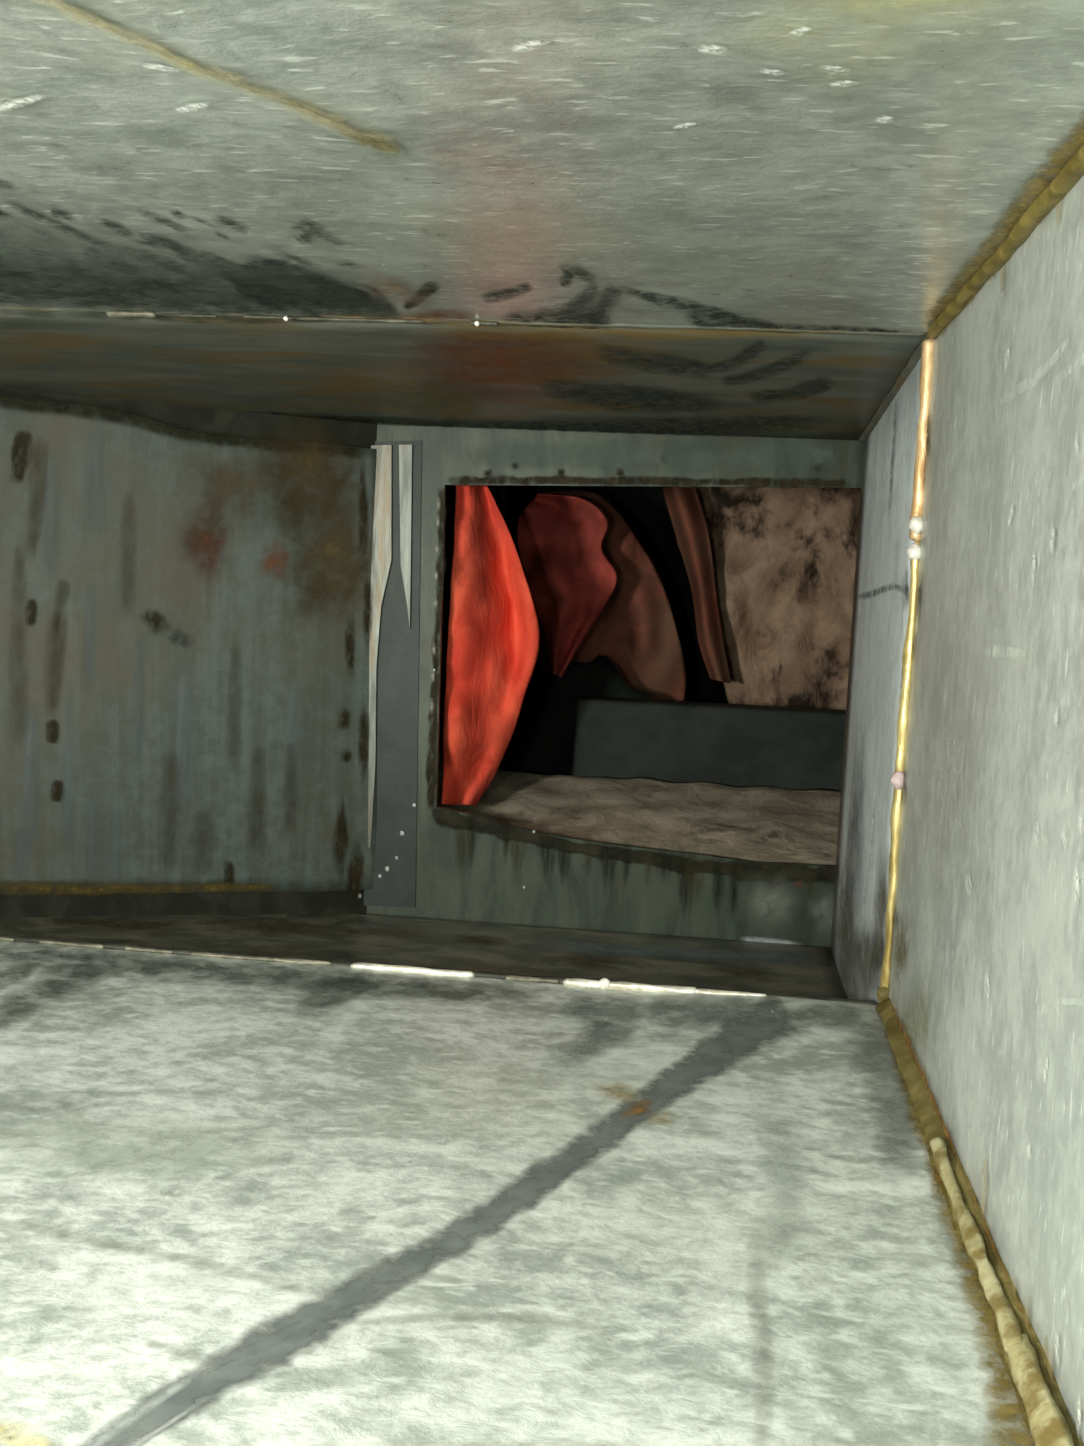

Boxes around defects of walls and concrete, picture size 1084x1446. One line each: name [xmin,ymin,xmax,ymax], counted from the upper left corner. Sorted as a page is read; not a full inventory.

damp [0,207,339,315]
rust [0,394,355,456]
rust [346,584,371,668]
rust [341,711,368,771]
rust [335,809,363,897]